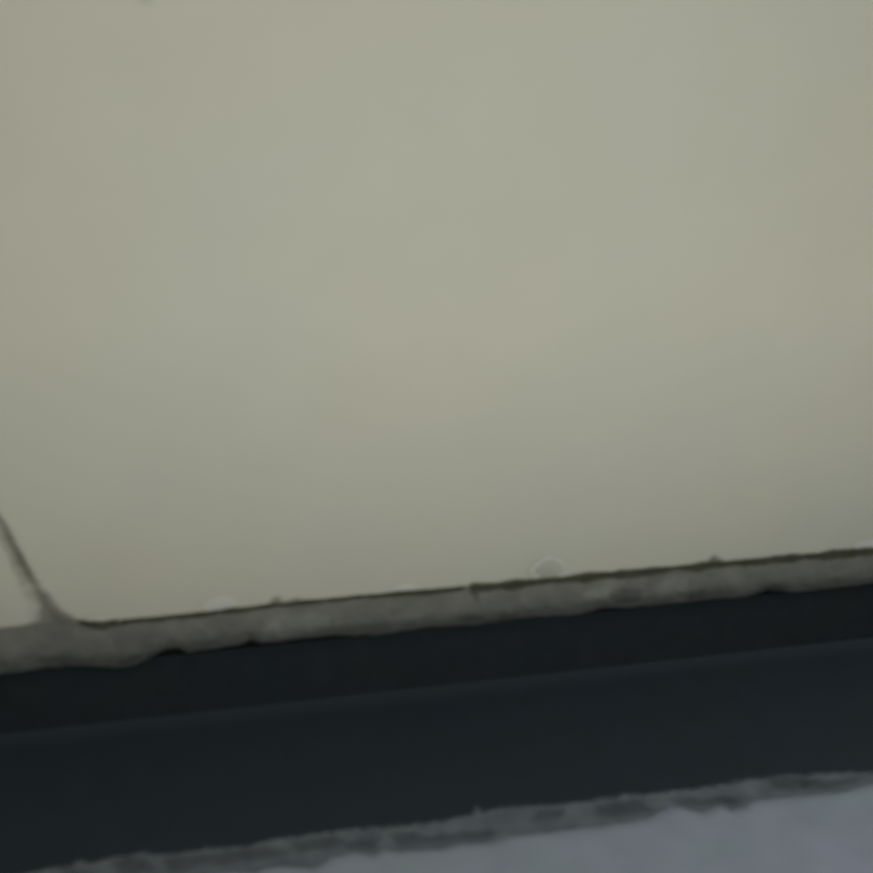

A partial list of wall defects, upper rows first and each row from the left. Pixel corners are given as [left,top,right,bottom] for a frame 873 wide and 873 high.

crack [0,515,873,630]